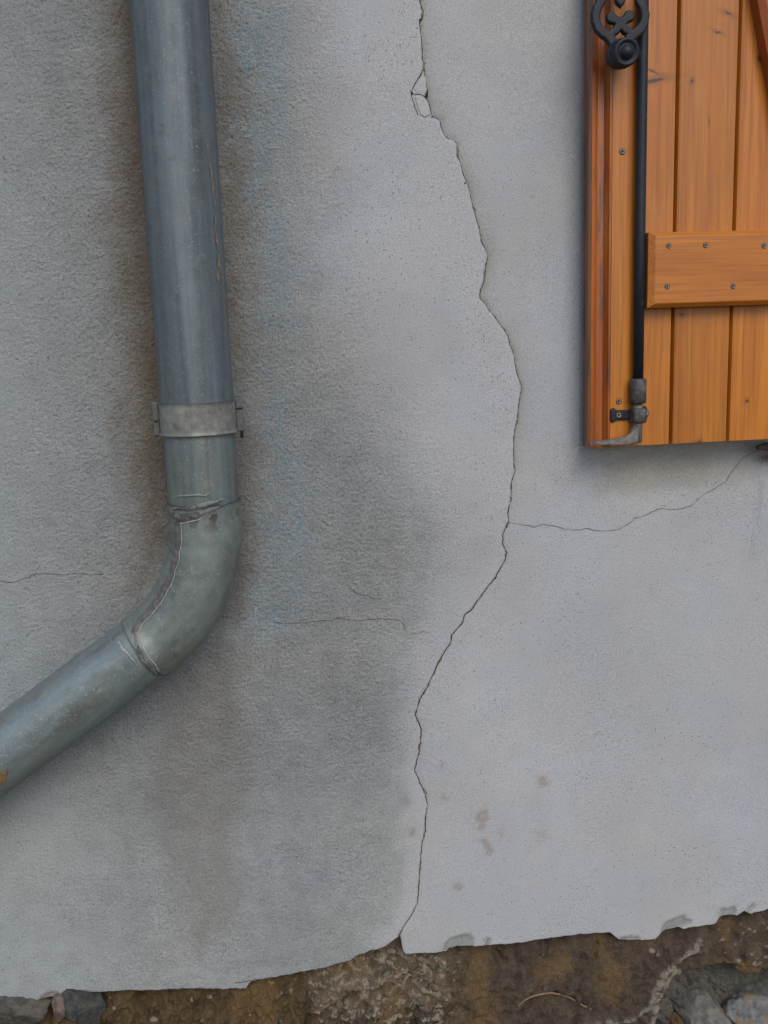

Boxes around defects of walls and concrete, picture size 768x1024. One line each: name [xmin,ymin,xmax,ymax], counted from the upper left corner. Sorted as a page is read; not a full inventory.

crack [275,0,758,937]
crack [0,573,103,583]
spalling [716,901,757,922]
spalling [658,913,695,936]
spalling [440,932,493,952]